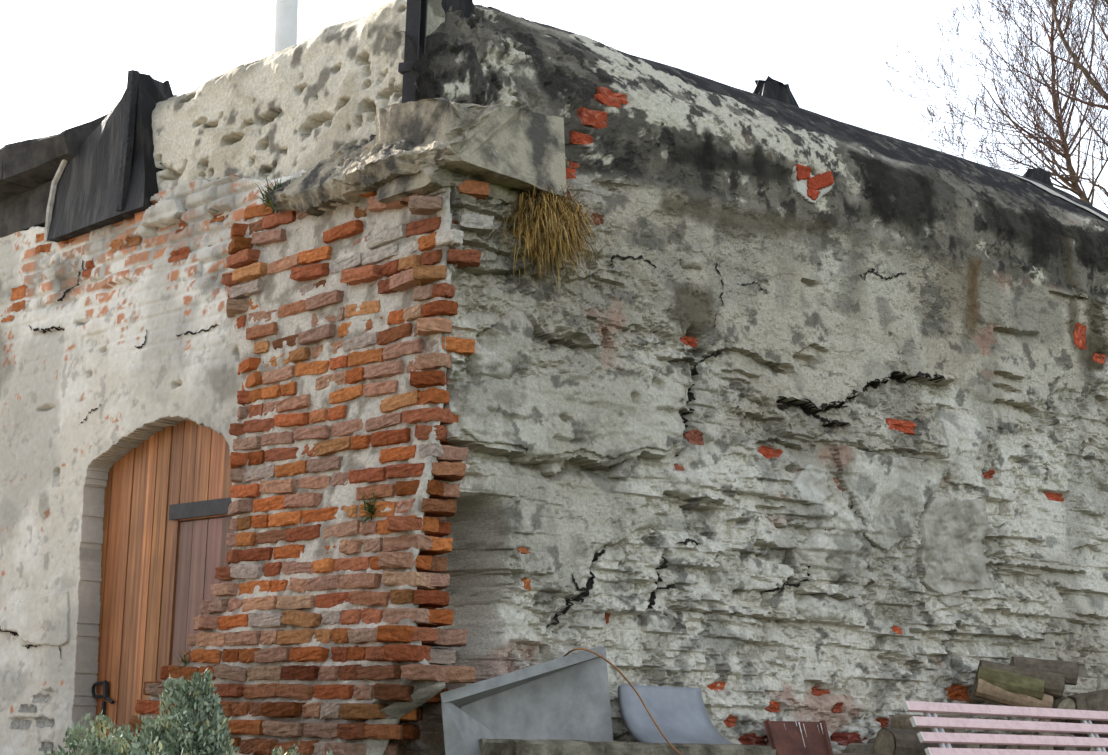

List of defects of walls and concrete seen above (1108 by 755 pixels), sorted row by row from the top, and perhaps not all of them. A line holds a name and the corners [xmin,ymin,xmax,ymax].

spalling [563,85,637,226]
water stain [670,130,789,182]
spalling [791,164,835,204]
water stain [856,153,935,236]
spalling [0,285,30,323]
spalling [80,198,192,282]
water stain [981,192,1108,368]
flaking render [457,367,714,478]
crack [776,371,945,427]
crack [546,546,605,628]
crack [0,629,61,658]
spalling [7,693,55,755]